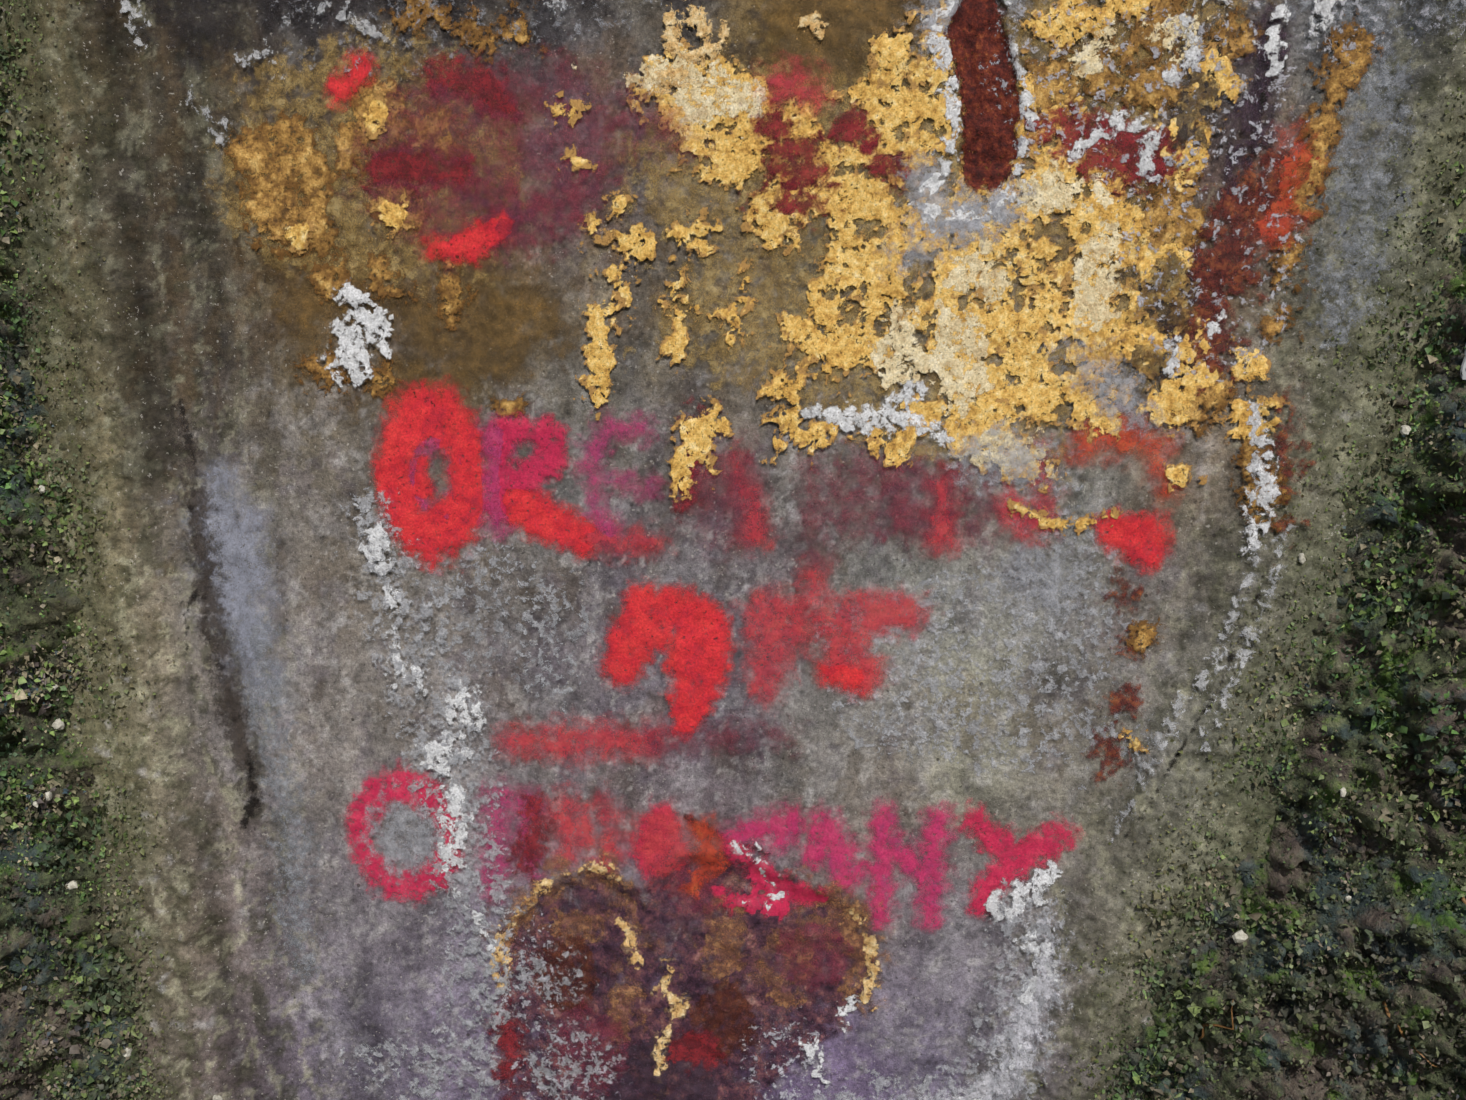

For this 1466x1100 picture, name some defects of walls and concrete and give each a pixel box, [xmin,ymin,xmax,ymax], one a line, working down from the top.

peeling [544,91,598,171]
peeling [573,0,1384,564]
peeling [1122,617,1165,659]
water stain [187,467,320,984]
peeling [1106,727,1158,762]